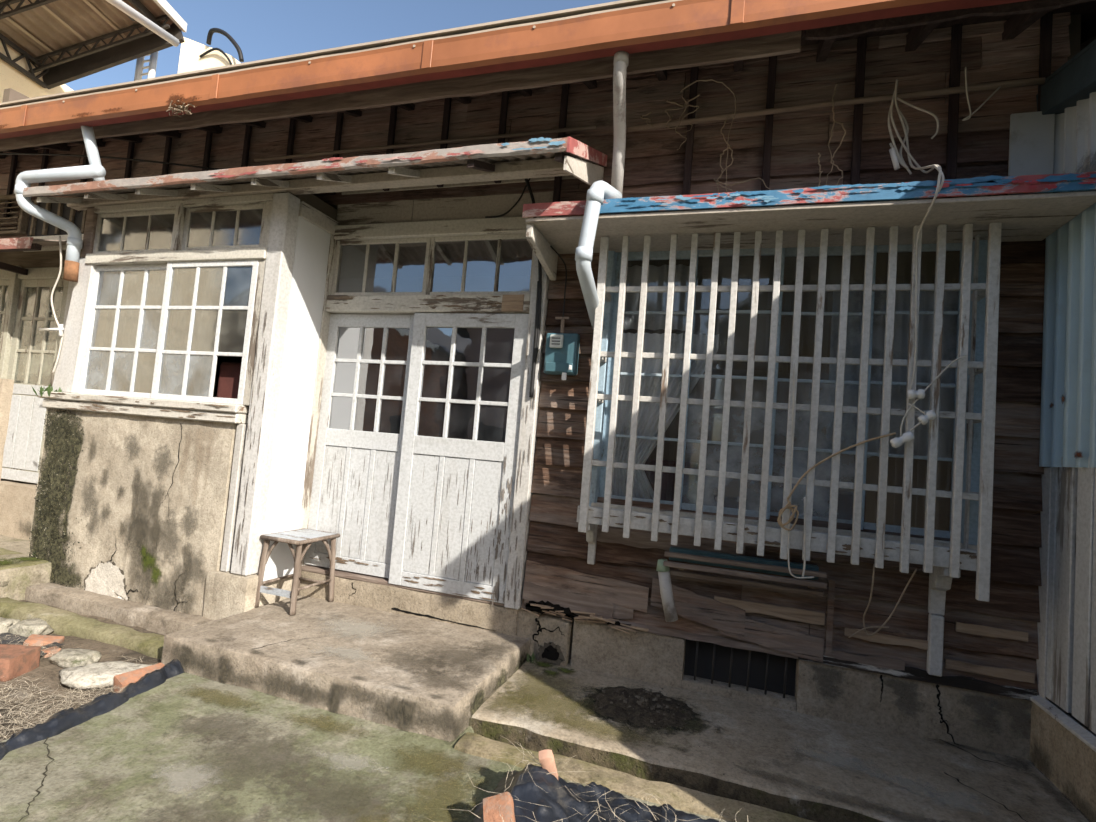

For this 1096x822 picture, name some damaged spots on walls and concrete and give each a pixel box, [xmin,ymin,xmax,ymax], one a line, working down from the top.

corrosion [166,95,197,104]
peeling [616,191,778,207]
peeling [792,173,1096,198]
leakage [25,414,109,557]
spalling [84,541,141,600]
leakage [155,452,168,475]
leakage [119,472,204,614]
crack [157,423,182,516]
peeling [403,439,530,610]
crack [532,618,565,646]
crack [936,684,1018,770]
crack [18,737,55,822]